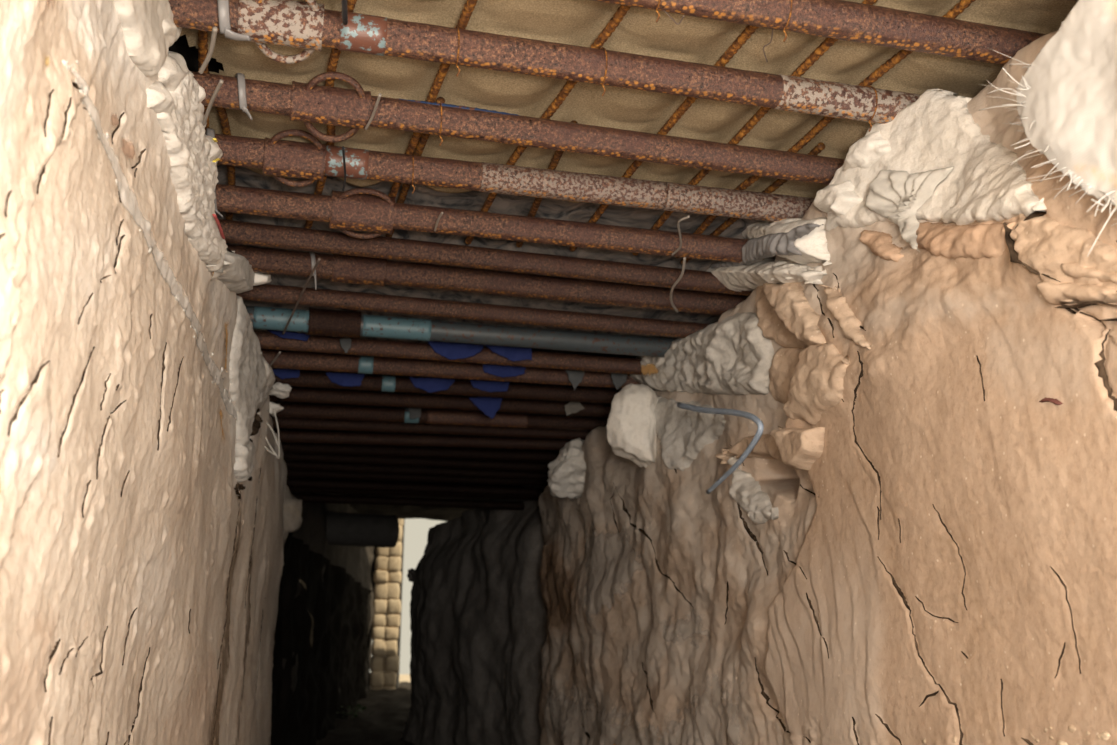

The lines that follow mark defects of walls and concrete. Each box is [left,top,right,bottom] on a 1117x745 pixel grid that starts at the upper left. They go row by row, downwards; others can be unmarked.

crack [0,82,87,239]
crack [111,112,125,144]
crack [77,149,146,324]
crack [1003,211,1117,411]
crack [0,360,50,436]
crack [57,346,130,518]
crack [149,314,184,450]
crack [813,273,967,745]
crack [44,608,150,745]
crack [755,658,811,743]
crack [1001,679,1033,745]
crack [1051,567,1081,678]